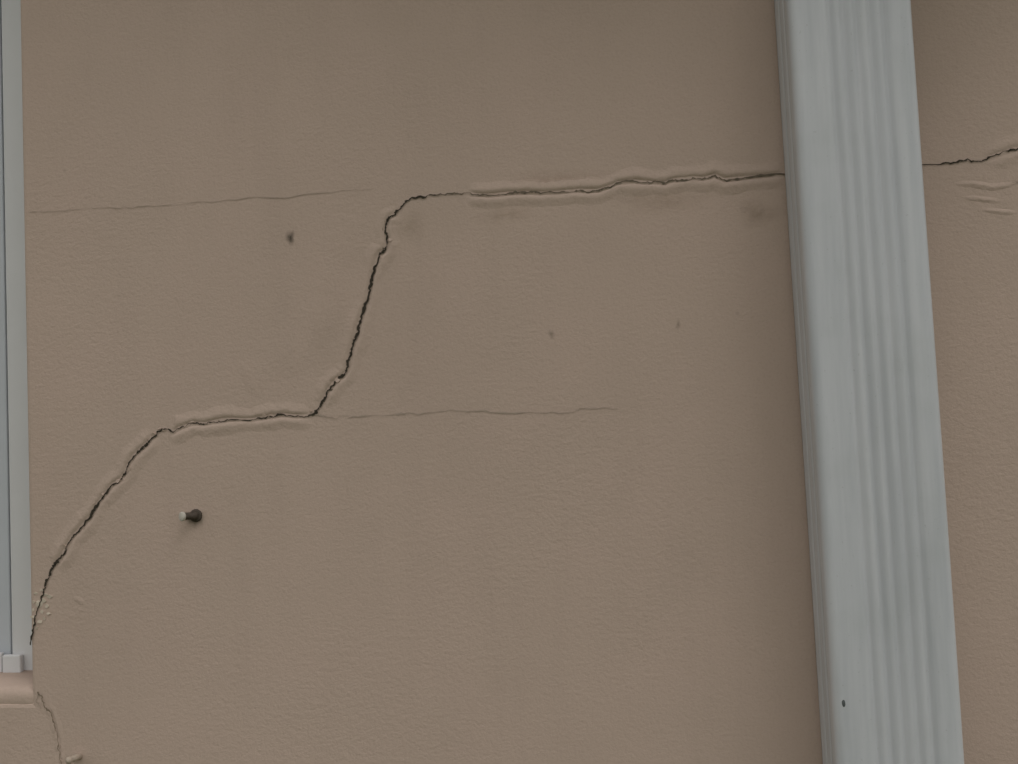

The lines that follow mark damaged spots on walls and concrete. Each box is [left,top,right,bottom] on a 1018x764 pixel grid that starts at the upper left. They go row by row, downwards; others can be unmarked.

crack [922,148,1018,165]
crack [30,173,785,645]
crack [35,692,66,764]